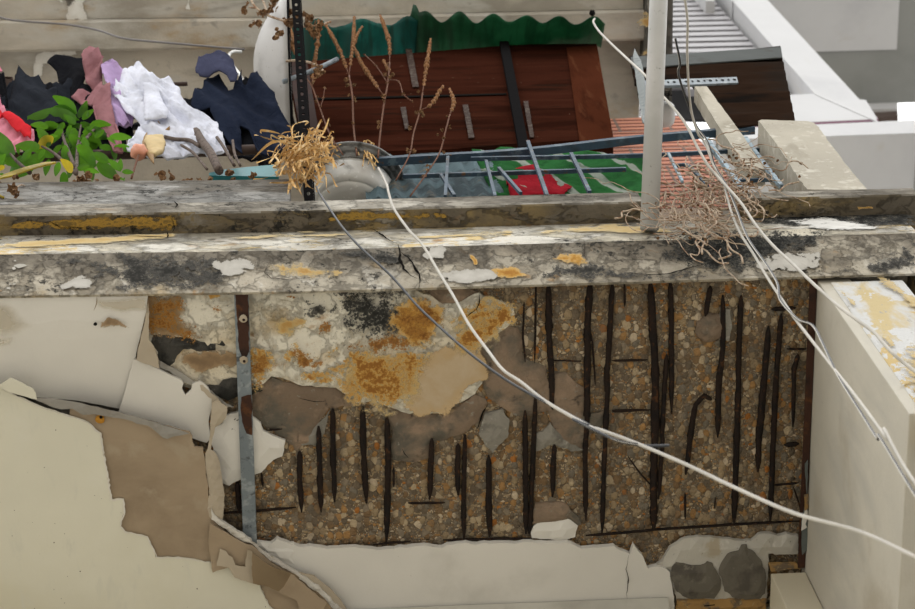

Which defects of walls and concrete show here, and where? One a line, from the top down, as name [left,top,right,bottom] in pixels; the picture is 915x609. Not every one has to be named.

peeling [60,275,92,290]
water stain [0,233,230,343]
peeling [212,257,255,276]
water stain [235,231,346,239]
mould [298,291,405,339]
water stain [339,251,399,264]
crack [370,228,421,287]
peeling [423,245,446,259]
water stain [542,214,915,282]
corrosion [182,294,517,435]
peeling [136,295,243,532]
spalling [249,252,821,609]